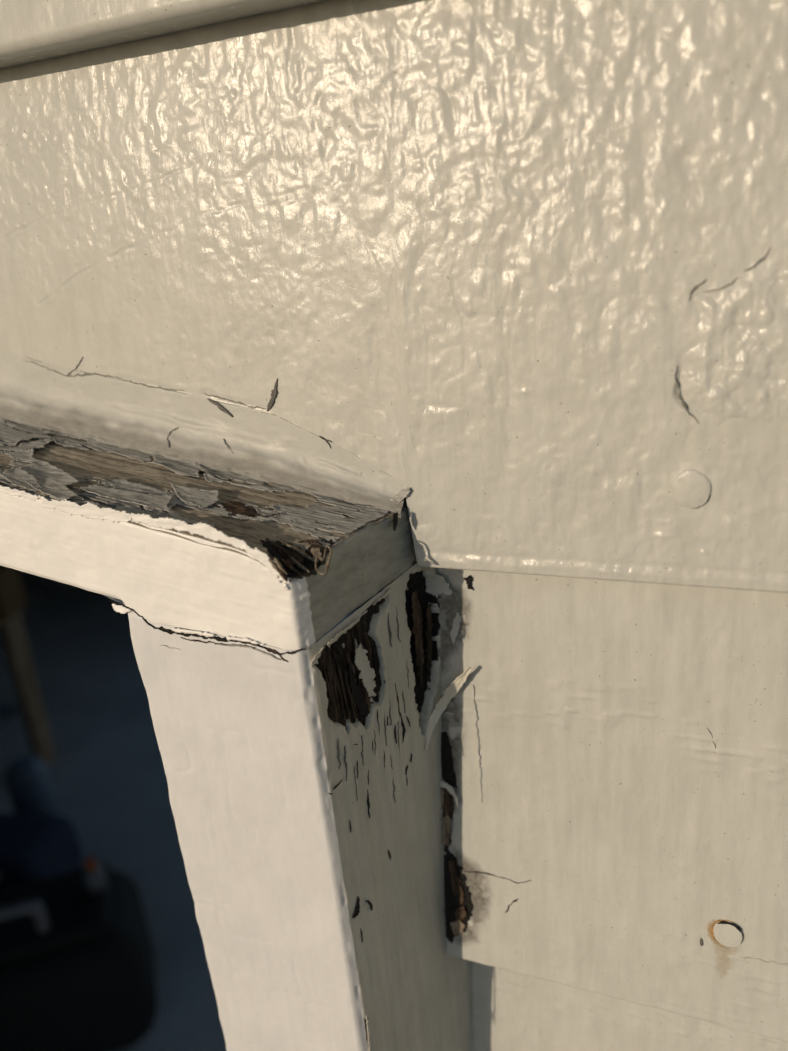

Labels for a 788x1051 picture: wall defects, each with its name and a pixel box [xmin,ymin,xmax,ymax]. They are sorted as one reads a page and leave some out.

crack [24,357,264,409]
spalling [266,378,278,412]
peeling [0,418,411,587]
crack [110,600,306,662]
peeling [311,588,393,666]
peeling [354,644,412,784]
peeling [425,667,472,751]
peeling [440,780,458,807]
peeling [352,896,373,943]